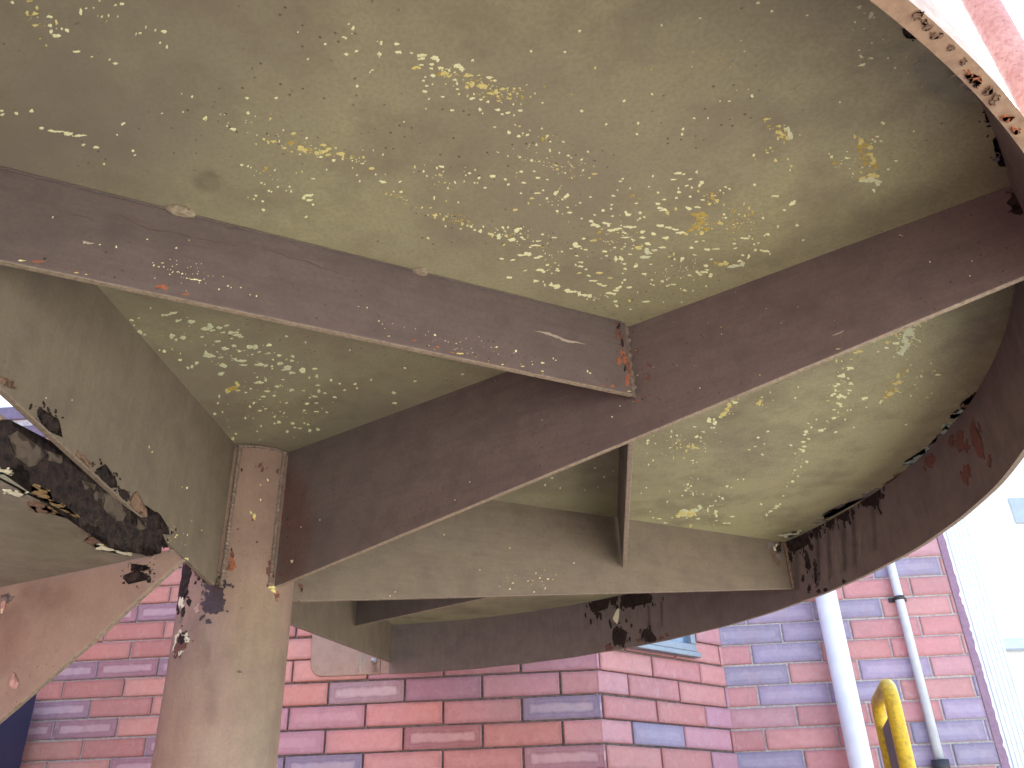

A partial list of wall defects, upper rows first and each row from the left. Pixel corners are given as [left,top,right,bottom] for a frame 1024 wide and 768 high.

rust [912,10,1022,135]
peeling [240,129,407,218]
peeling [363,41,779,310]
peeling [150,307,358,440]
rust [601,322,652,402]
peeling [2,484,132,556]
peeling [760,348,863,518]
peeling [778,392,976,562]
rust [948,416,992,486]
peeling [194,567,235,624]
peeling [585,593,670,651]
rust [801,550,828,594]